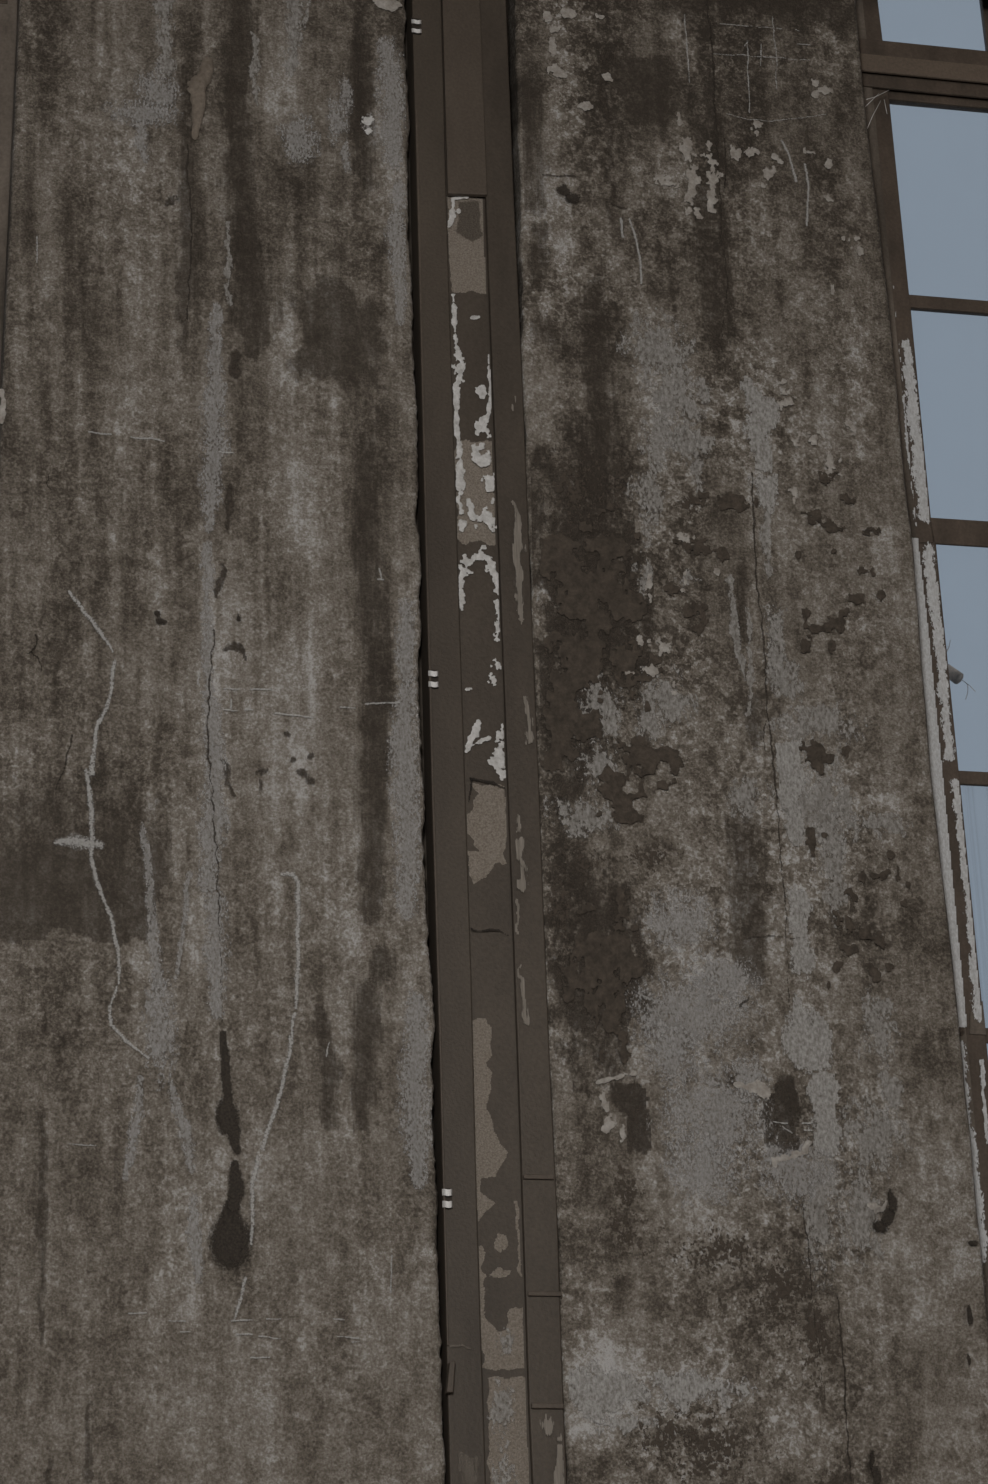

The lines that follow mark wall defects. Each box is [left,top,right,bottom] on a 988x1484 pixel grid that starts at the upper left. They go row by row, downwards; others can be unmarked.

leakage [103,0,181,163]
leakage [249,31,261,106]
leakage [282,0,311,77]
peeling [447,196,526,691]
leakage [531,307,914,928]
leakage [122,221,253,1283]
peeling [523,696,534,745]
peeling [472,1018,508,1221]
peeling [517,965,530,1026]
leakage [547,870,912,1290]
peeling [450,1201,564,1484]
leakage [568,1359,758,1439]